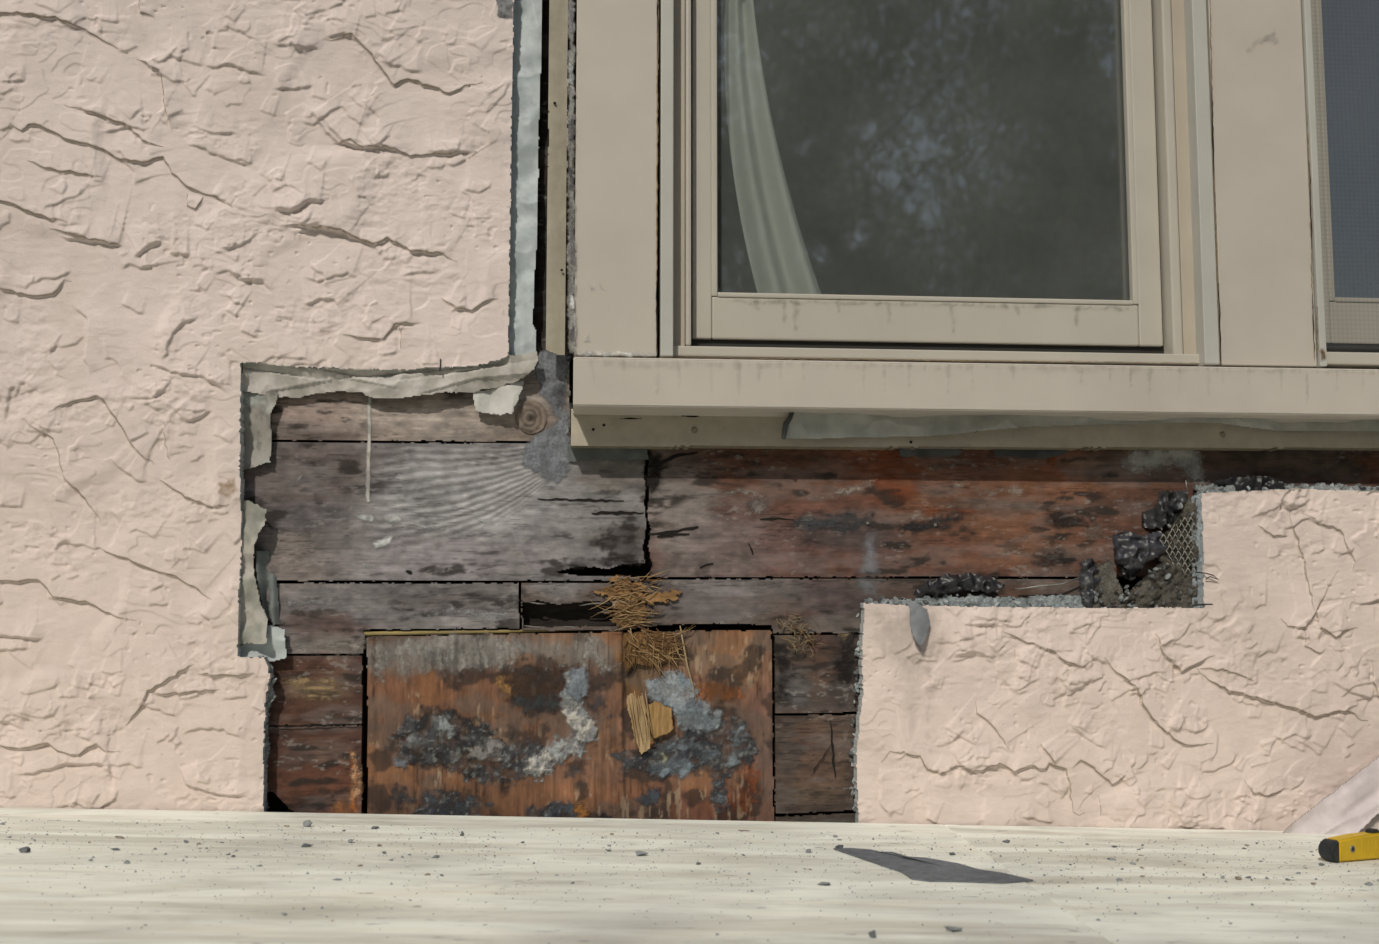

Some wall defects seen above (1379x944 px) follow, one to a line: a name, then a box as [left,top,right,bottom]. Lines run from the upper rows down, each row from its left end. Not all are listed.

crack [537,498,698,538]
spalling [856,594,1086,617]
spalling [258,656,277,812]
leakage [385,705,544,816]
leakage [325,636,615,717]
peeling [524,668,612,782]
leakage [526,801,612,818]
leakage [611,716,759,814]
spalling [848,641,860,812]